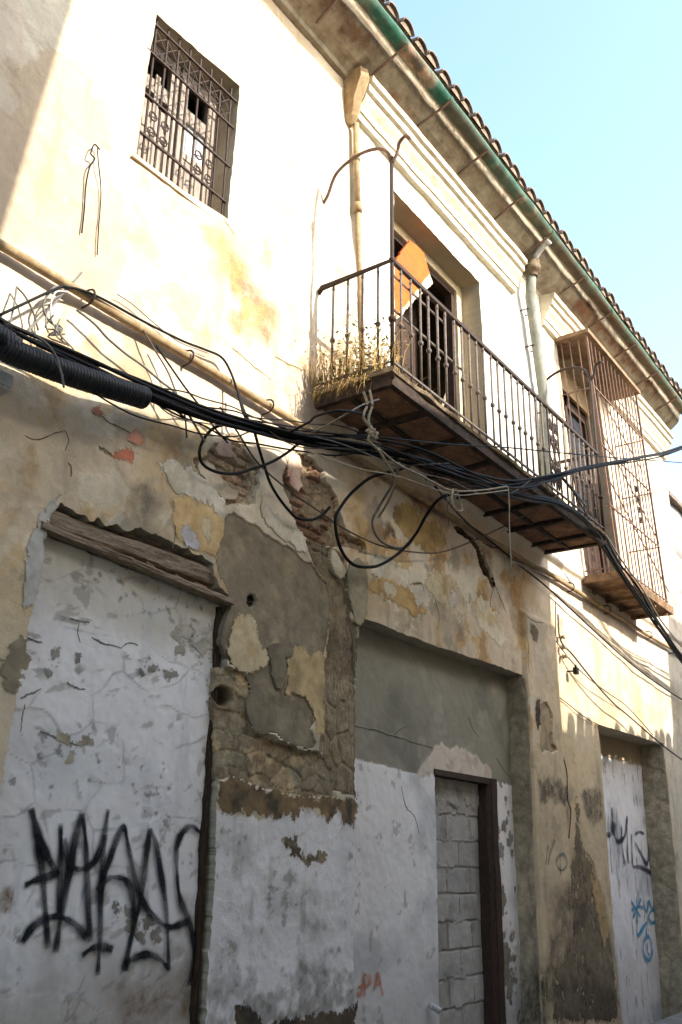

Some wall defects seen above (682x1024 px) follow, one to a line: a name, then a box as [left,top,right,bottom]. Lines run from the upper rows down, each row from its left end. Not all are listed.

peeling [112,429,145,464]
peeling [0,634,31,694]
crack [70,618,138,649]
peeling [158,435,509,868]
crack [20,688,79,746]
crack [355,724,432,748]
spalling [535,699,555,752]
water stain [522,868,586,1023]